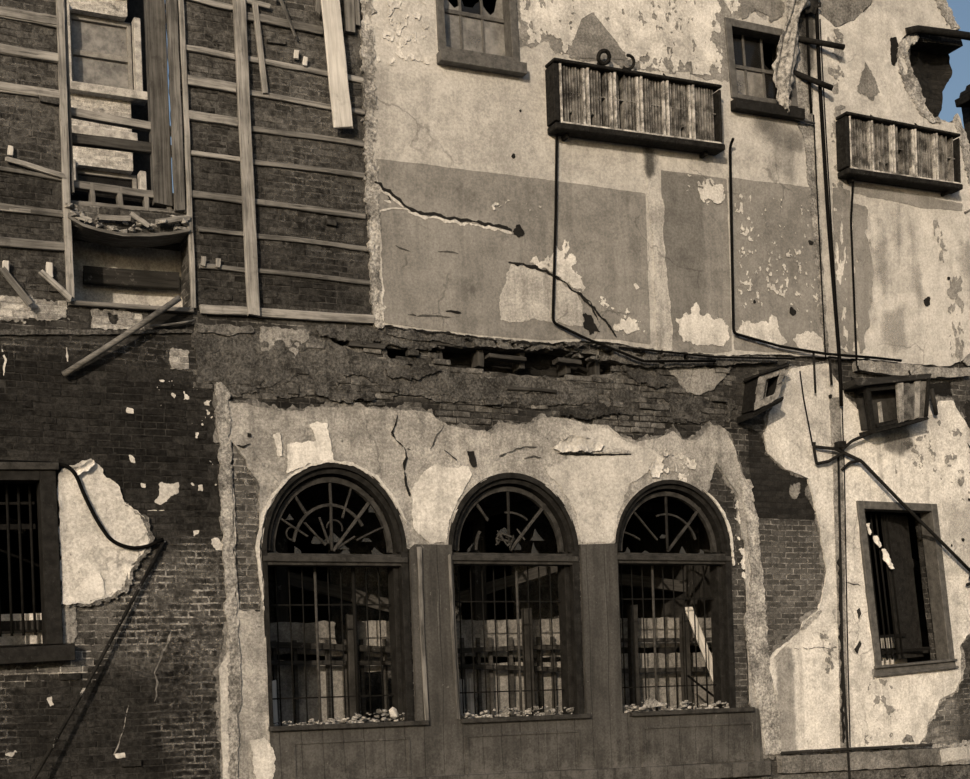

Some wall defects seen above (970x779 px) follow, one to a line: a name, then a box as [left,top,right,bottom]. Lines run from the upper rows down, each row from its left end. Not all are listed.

peeling [517,0,785,82]
spalling [890,34,970,185]
spalling [315,324,445,352]
crack [374,181,552,345]
crack [508,261,617,338]
spalling [583,313,600,335]
peeling [676,174,824,352]
peeling [947,275,970,366]
spalling [930,382,952,397]
crack [391,415,462,497]
spalling [907,400,970,501]
spalling [864,633,970,749]